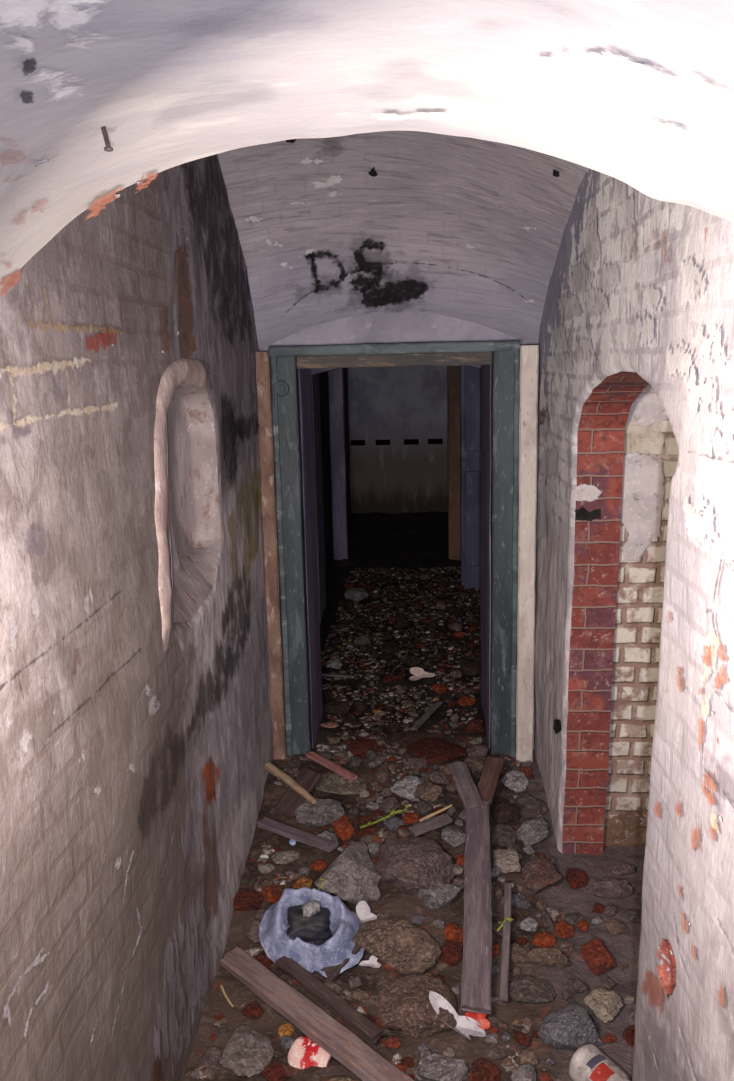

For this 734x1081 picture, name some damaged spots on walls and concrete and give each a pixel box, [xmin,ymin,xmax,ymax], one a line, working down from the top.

peeling [22,59,37,76]
peeling [20,92,33,104]
peeling [84,187,123,221]
peeling [136,173,158,193]
peeling [0,270,20,296]
spalling [574,507,601,521]
crack [706,551,734,637]
crack [0,591,121,698]
crack [49,649,140,737]
peeling [698,630,727,752]
peeling [691,772,722,850]
spalling [656,938,676,995]